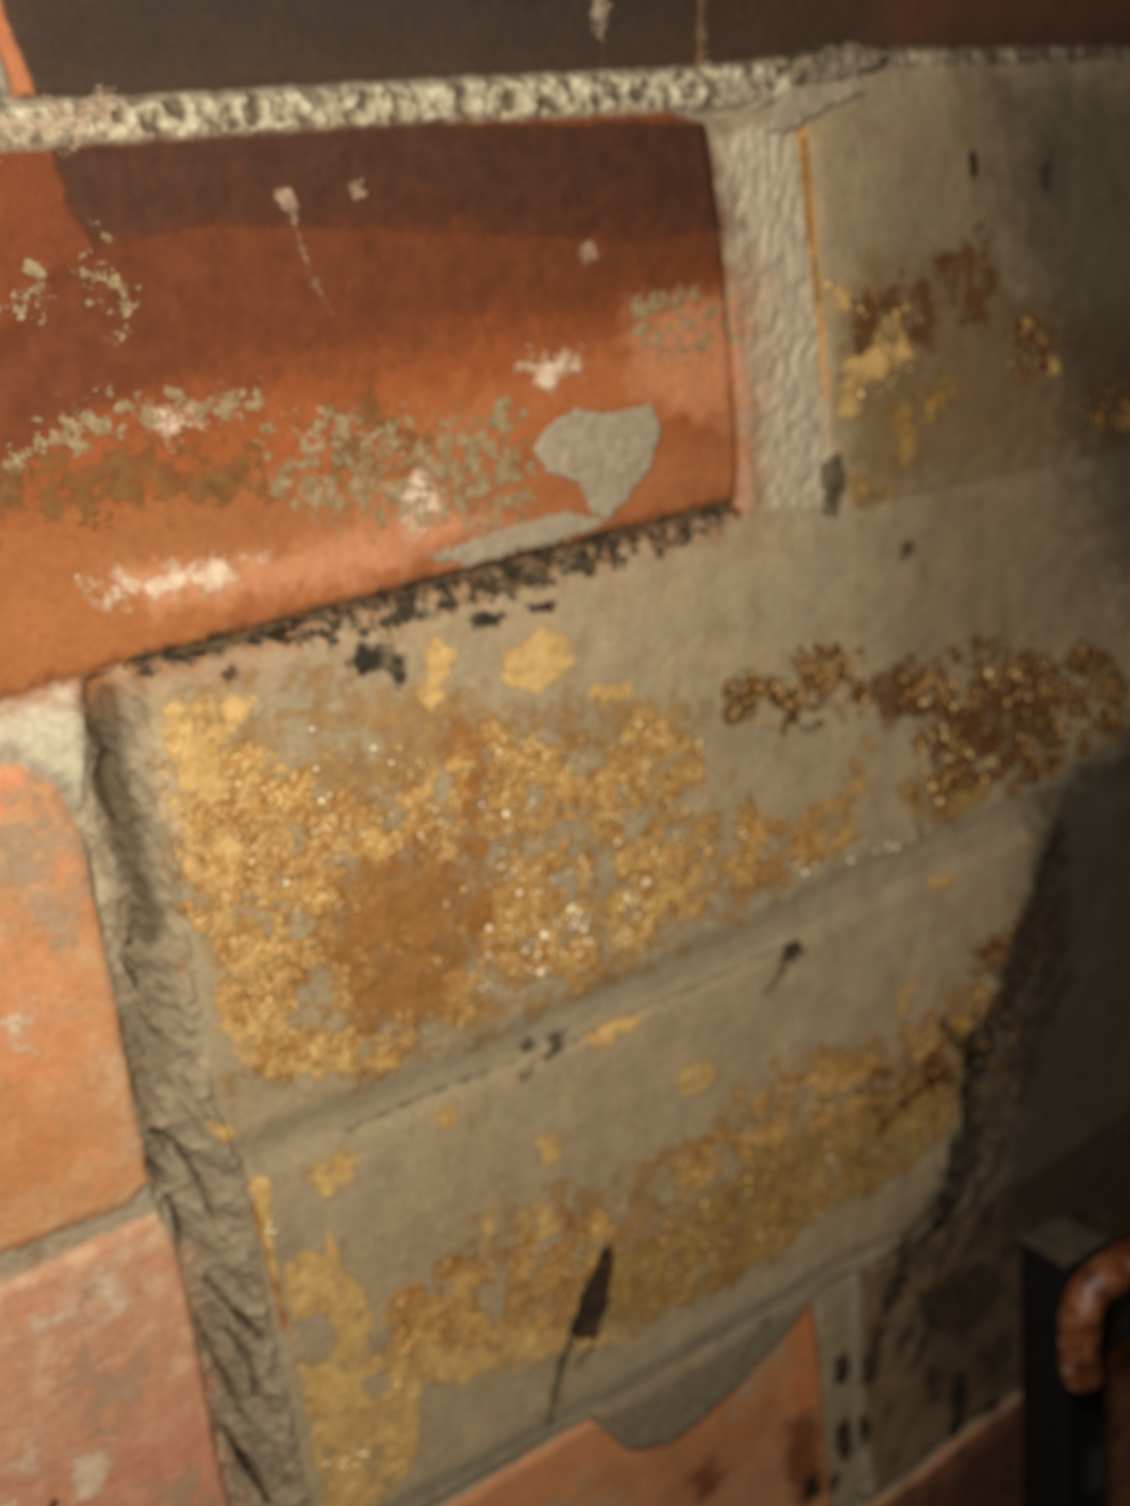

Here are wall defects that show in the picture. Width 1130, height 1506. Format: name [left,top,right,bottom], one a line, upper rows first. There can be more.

peeling [0,258,50,325]
peeling [71,221,140,345]
peeling [518,352,581,390]
peeling [0,376,615,568]
water stain [397,471,446,532]
water stain [105,560,236,604]
peeling [155,624,1130,1097]
peeling [208,1119,236,1143]
peeling [306,1151,359,1197]
peeling [248,1176,637,1506]